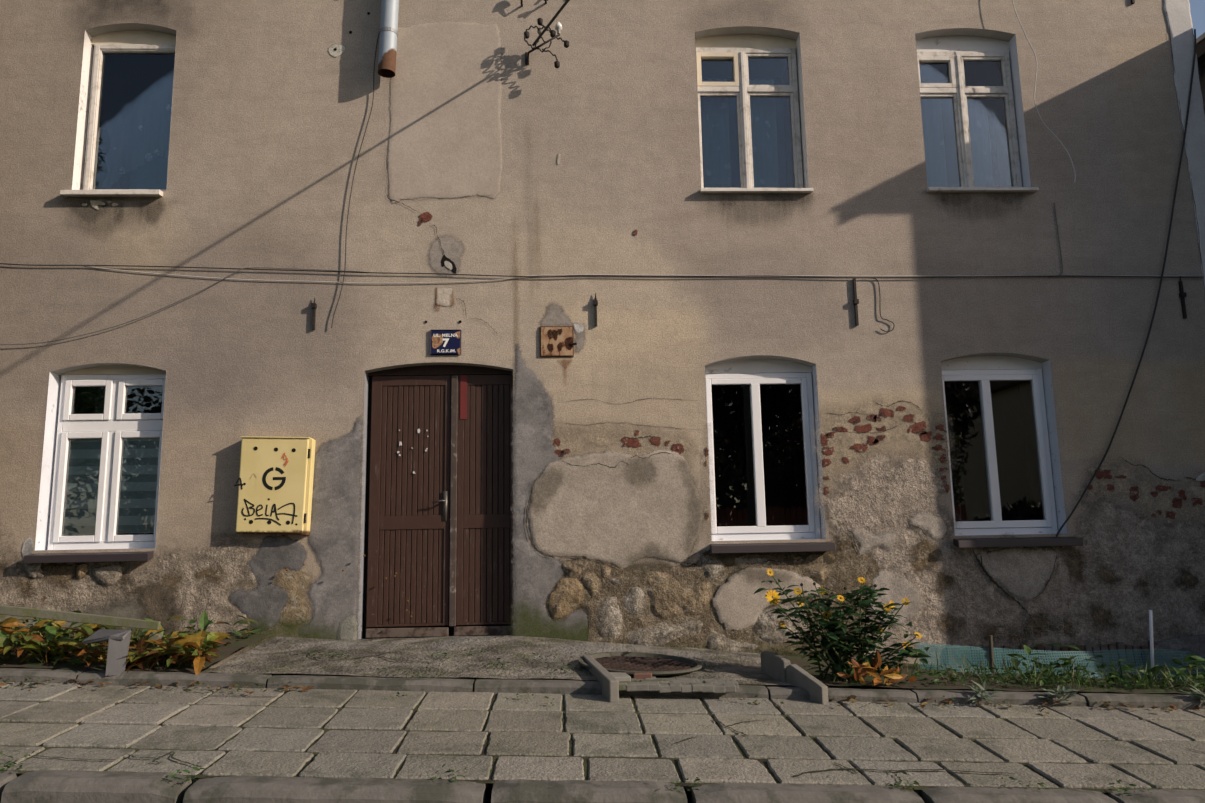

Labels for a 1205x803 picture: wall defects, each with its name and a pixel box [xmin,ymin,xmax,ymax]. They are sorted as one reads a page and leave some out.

spalling [441,255,457,274]
flaking render [552,424,709,485]
flaking render [704,400,1205,678]
flaking render [0,533,263,639]
flaking render [274,569,312,628]